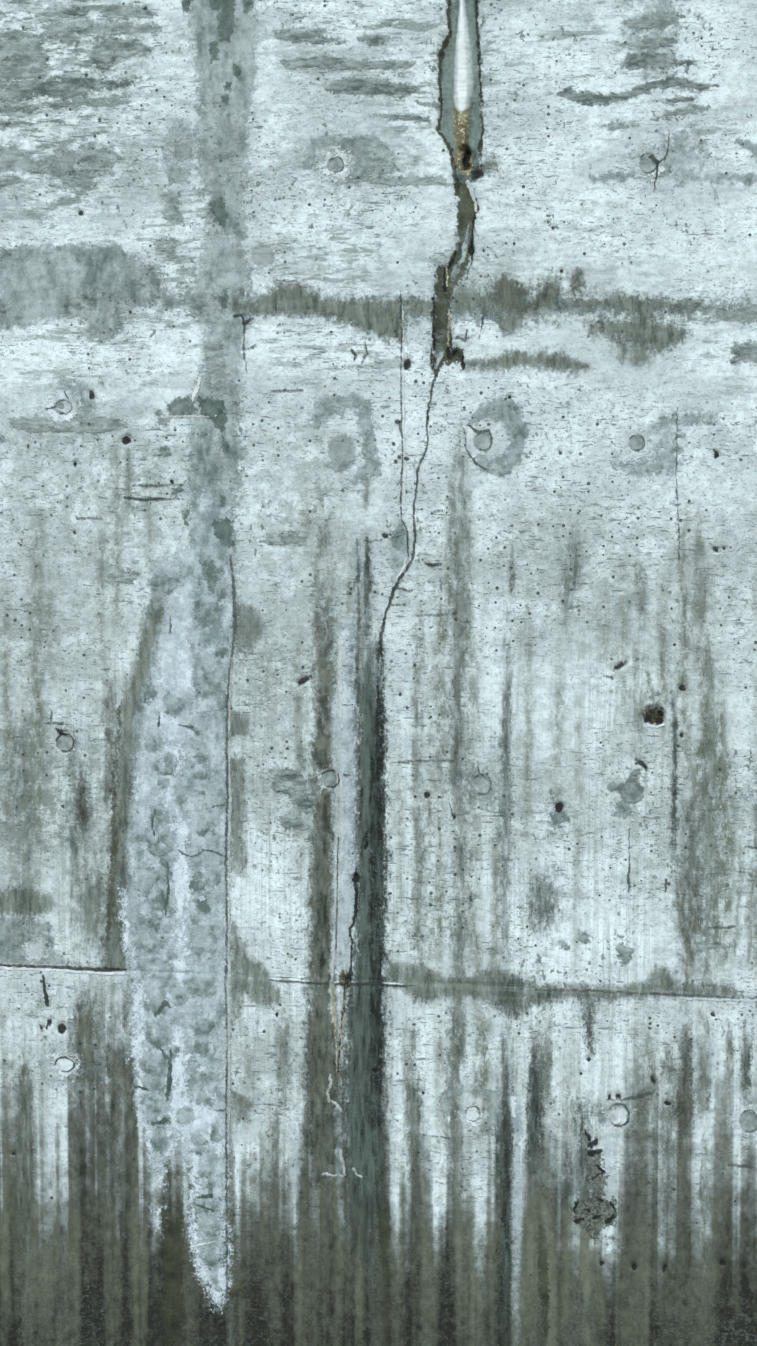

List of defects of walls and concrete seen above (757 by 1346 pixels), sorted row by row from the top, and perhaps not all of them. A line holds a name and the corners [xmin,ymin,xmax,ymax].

crack [351,341,368,364]
crack [365,0,485,660]
damp [463,350,588,376]
damp [451,268,757,365]
crack [463,424,493,469]
damp [357,536,374,612]
damp [449,482,470,832]
damp [498,678,512,838]
damp [670,698,679,841]
damp [674,801,715,975]
damp [387,838,679,1130]
damp [727,1037,753,1091]